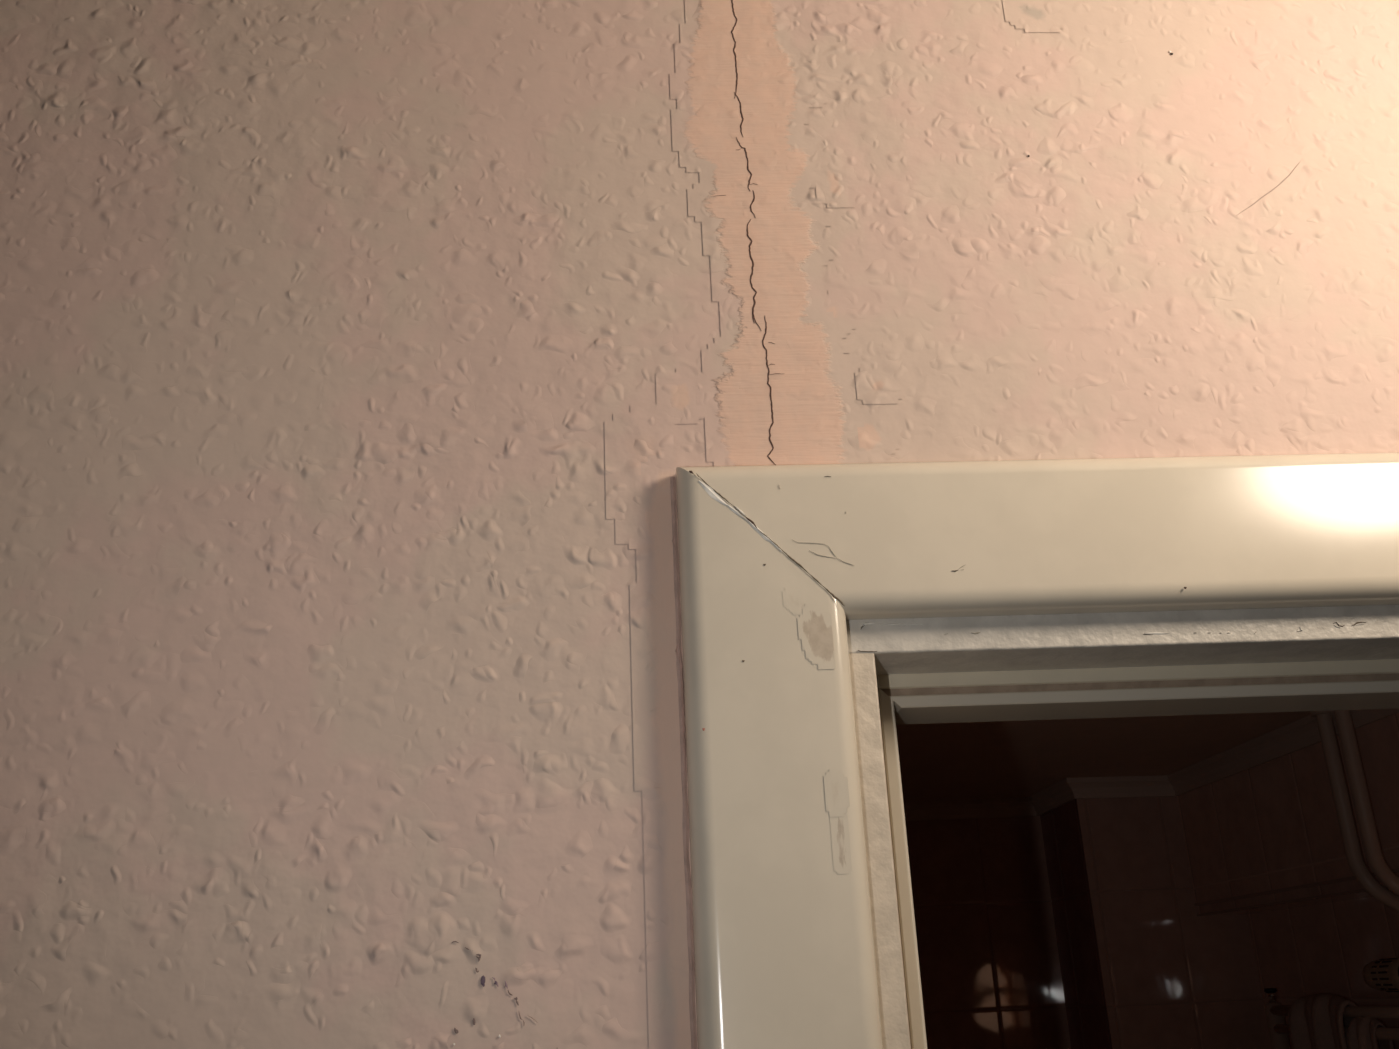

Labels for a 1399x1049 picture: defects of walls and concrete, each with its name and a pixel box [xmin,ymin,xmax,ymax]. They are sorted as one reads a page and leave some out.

crack [717,0,781,465]